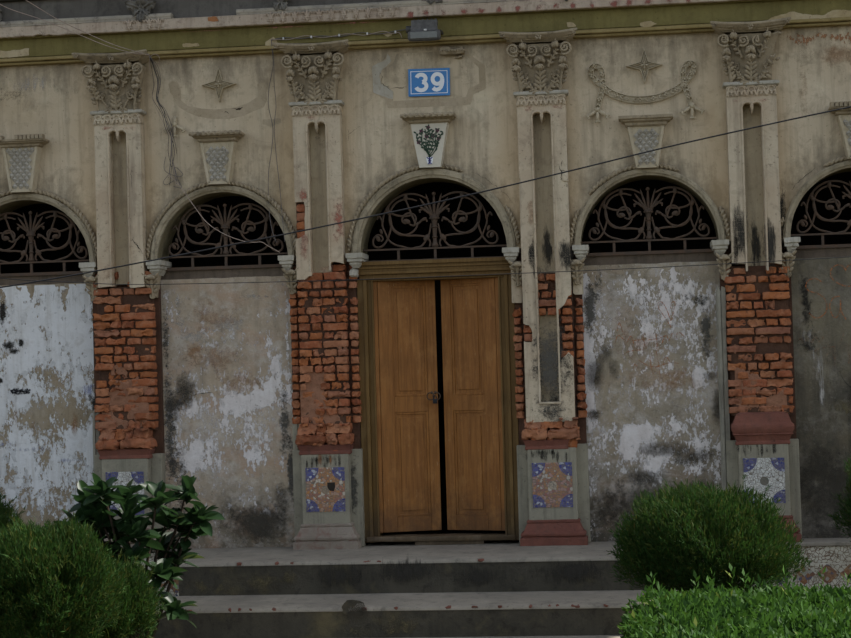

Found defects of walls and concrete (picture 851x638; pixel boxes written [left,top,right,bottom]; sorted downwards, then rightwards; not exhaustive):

water stain [165,379,193,486]
peeling [0,256,362,523]
flaking render [511,258,795,499]